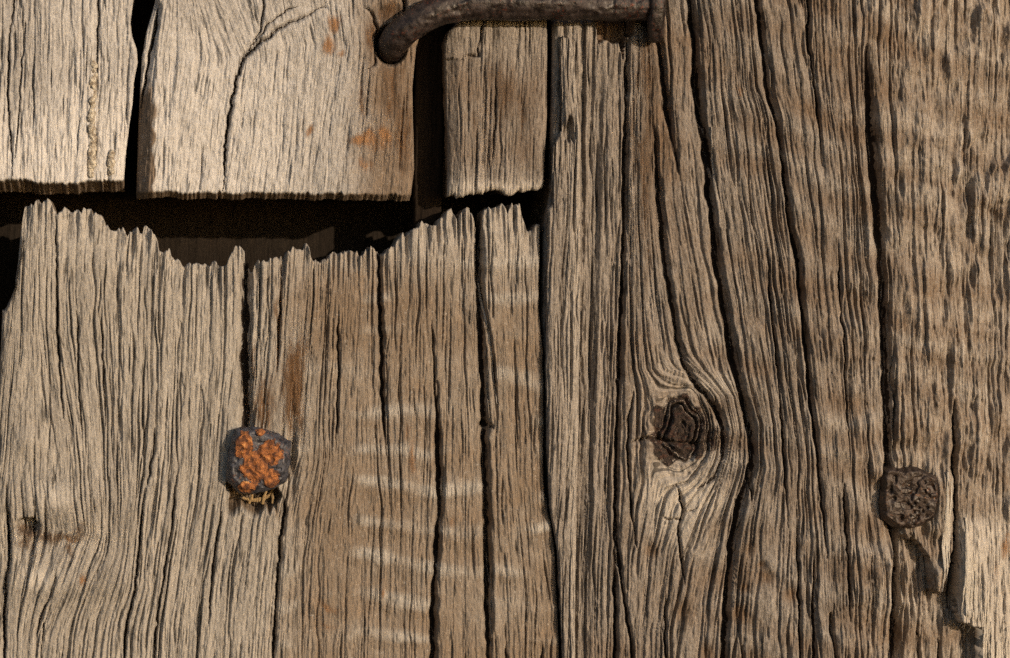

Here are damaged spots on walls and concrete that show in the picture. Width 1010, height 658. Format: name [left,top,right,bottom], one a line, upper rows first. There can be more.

crack [222,0,326,194]
corrosion [235,357,284,493]
corrosion [284,344,304,427]